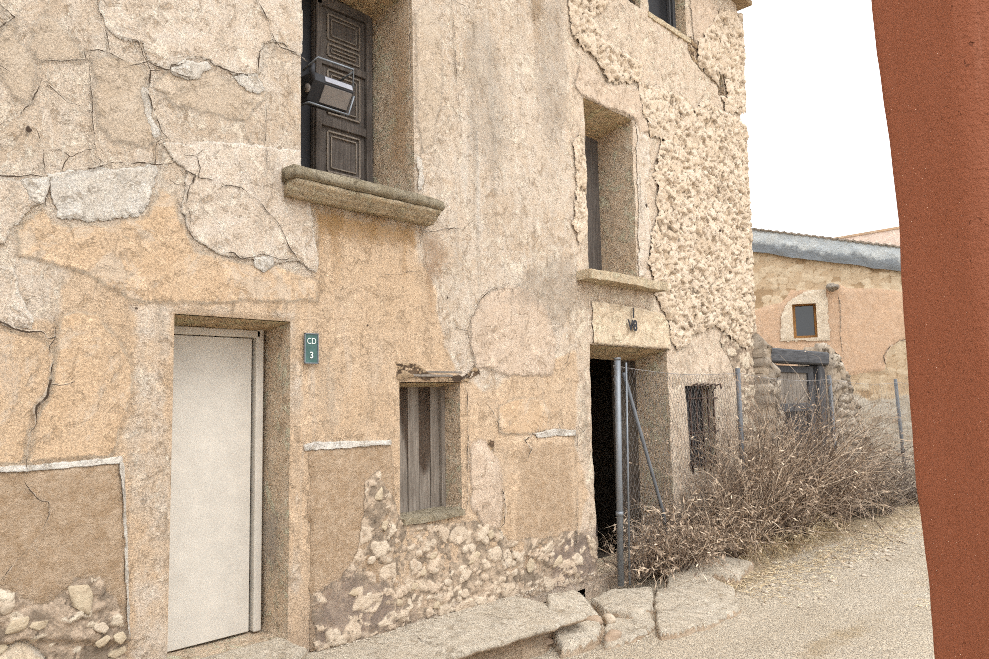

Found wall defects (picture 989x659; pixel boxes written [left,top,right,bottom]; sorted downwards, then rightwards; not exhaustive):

crack [0,0,319,277]
flaking render [568,0,758,451]
crack [0,321,75,580]
flaking render [0,577,131,659]
flaking render [310,470,603,652]